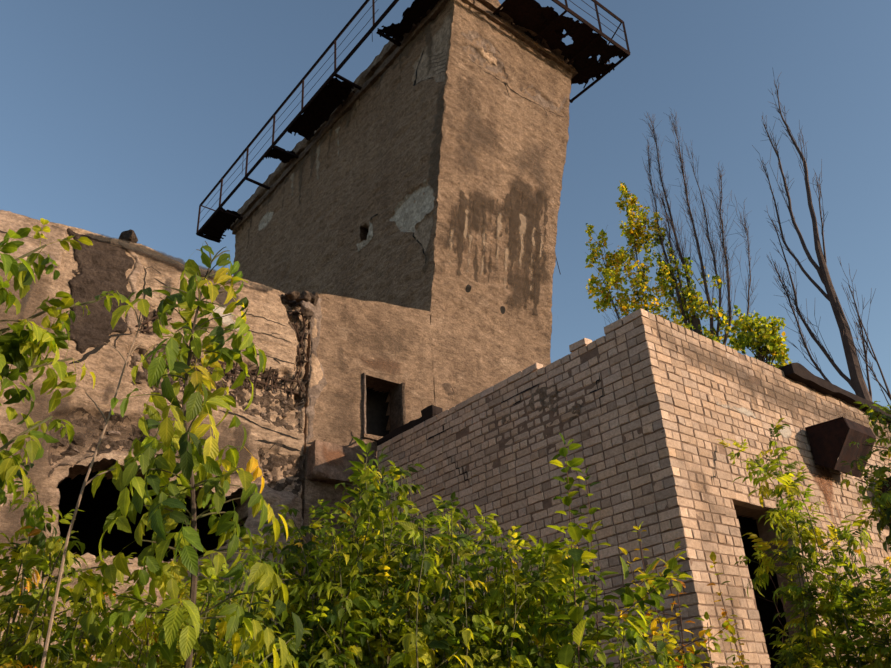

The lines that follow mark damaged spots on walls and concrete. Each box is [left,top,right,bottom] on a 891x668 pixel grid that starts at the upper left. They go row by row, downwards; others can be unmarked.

spalling [357,221,373,252]
peeling [390,179,435,252]
water stain [442,152,549,316]
peeling [0,210,328,444]
spalling [48,407,145,477]
spalling [257,447,305,497]